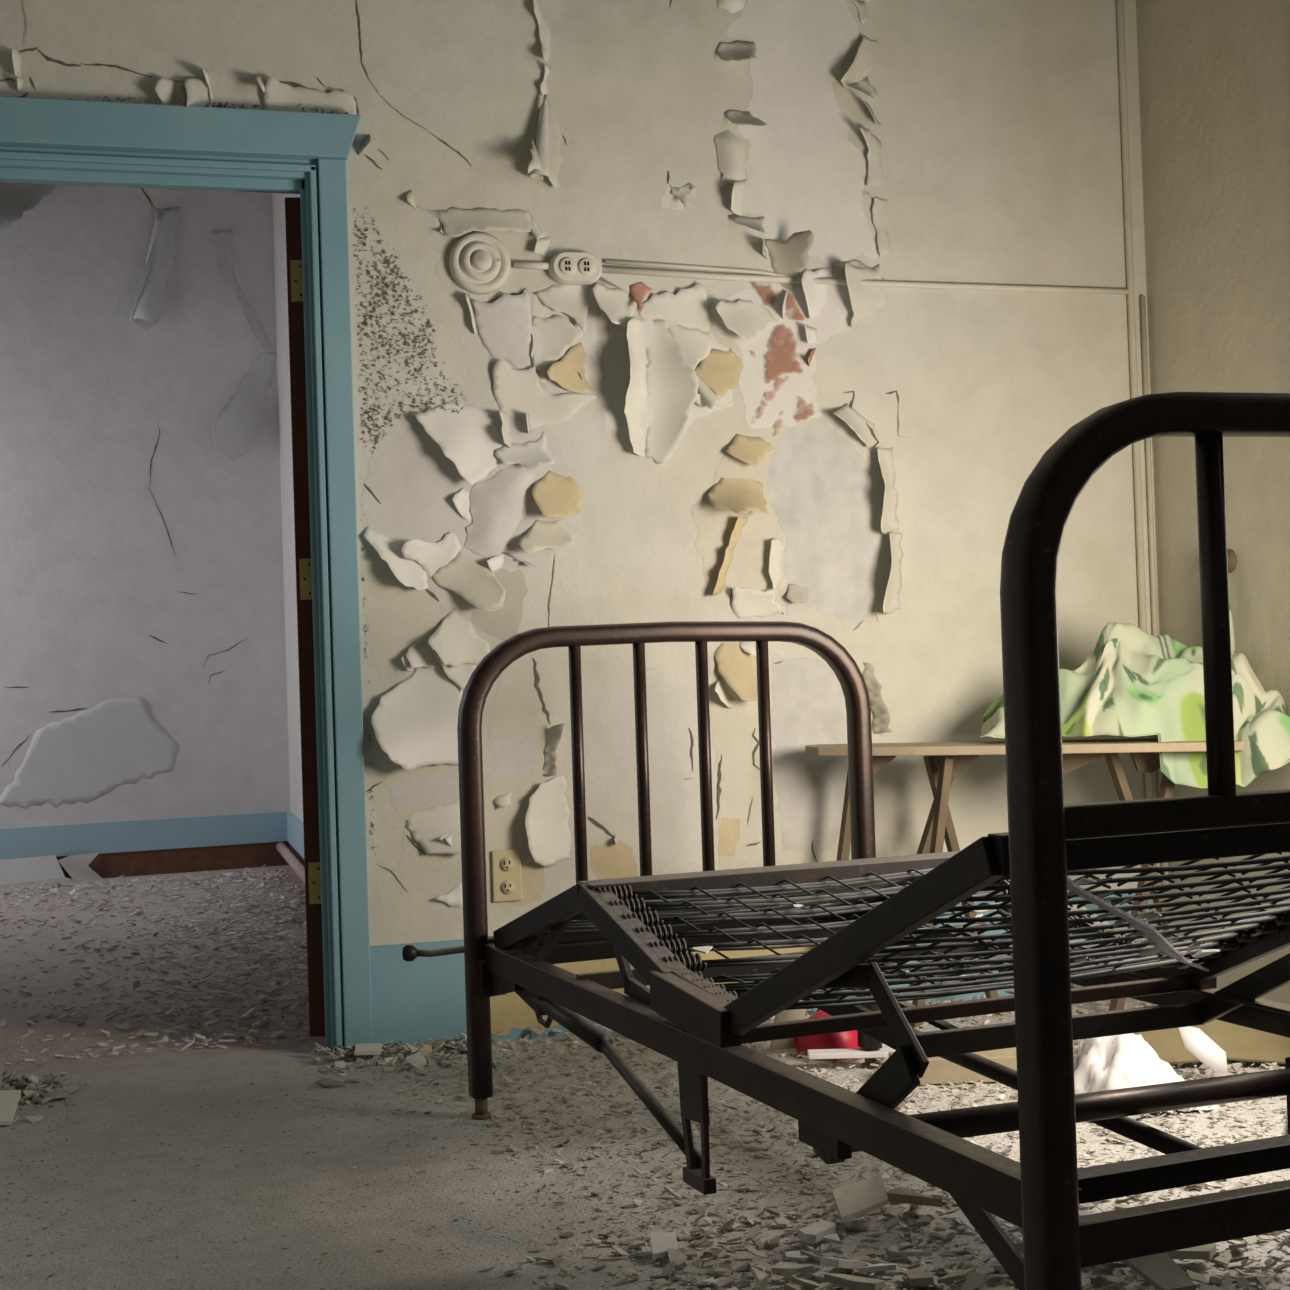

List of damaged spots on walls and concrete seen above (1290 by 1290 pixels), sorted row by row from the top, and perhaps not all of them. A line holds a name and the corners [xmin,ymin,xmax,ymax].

peeling [0,47,213,108]
peeling [256,75,359,115]
crack [356,0,472,166]
water stain [354,208,466,454]
rust [752,282,804,418]
peeling [358,0,903,908]
rust [775,401,814,436]